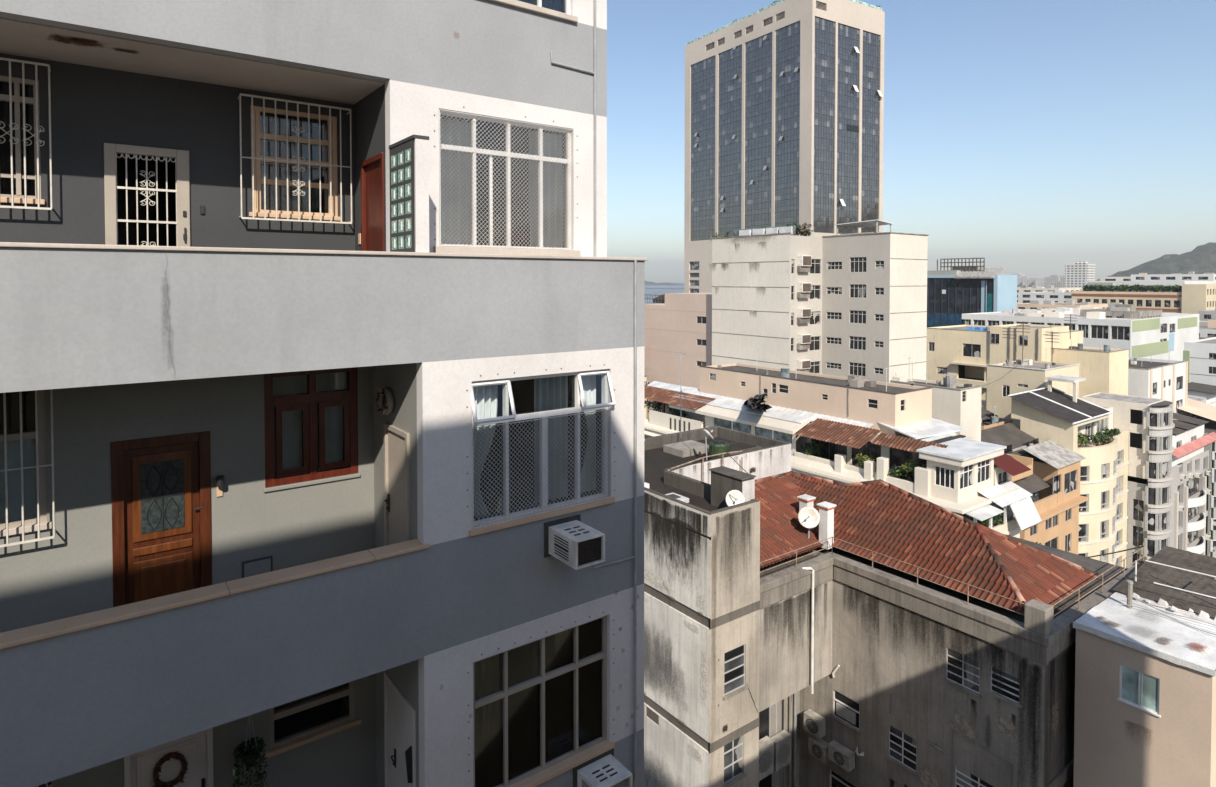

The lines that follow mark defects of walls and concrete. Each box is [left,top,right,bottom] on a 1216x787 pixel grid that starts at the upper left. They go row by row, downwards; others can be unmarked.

damp [644,493,750,577]
damp [845,586,1076,737]